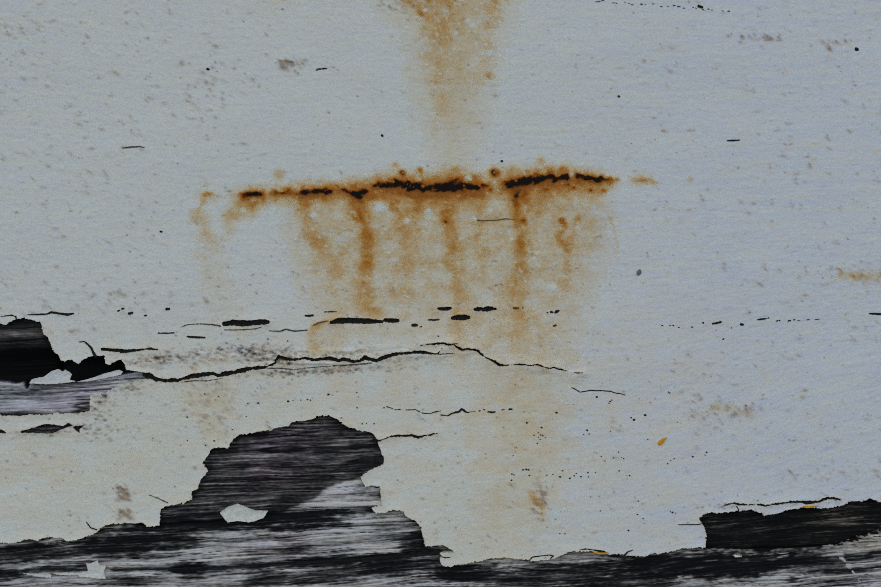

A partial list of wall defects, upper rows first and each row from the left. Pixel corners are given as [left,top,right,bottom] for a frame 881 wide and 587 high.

rust [240,169,612,220]
crack [0,311,74,320]
peeling [0,317,149,434]
crack [79,306,625,395]
peeling [0,415,881,587]